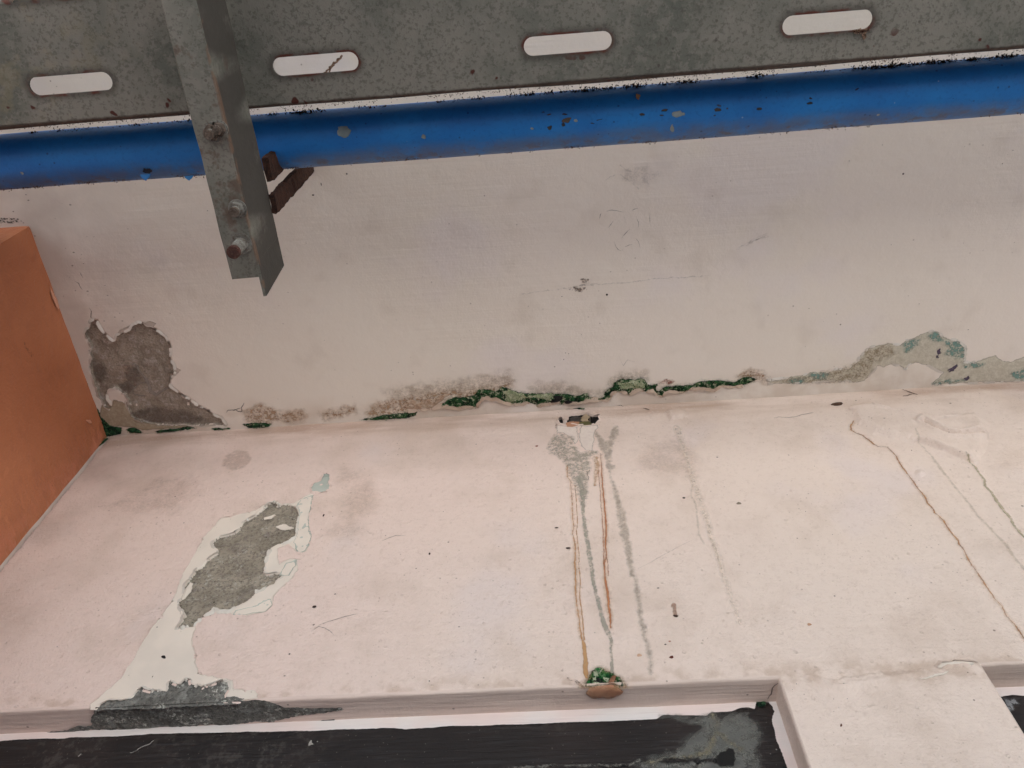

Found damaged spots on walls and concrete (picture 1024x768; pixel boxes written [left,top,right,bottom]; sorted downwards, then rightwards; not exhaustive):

peeling [83,318,228,430]
spalling [556,414,602,450]
peeling [766,330,1024,386]
peeling [47,473,344,733]
corrosion [567,467,588,678]
leakage [551,436,614,673]
corrosion [594,457,611,628]